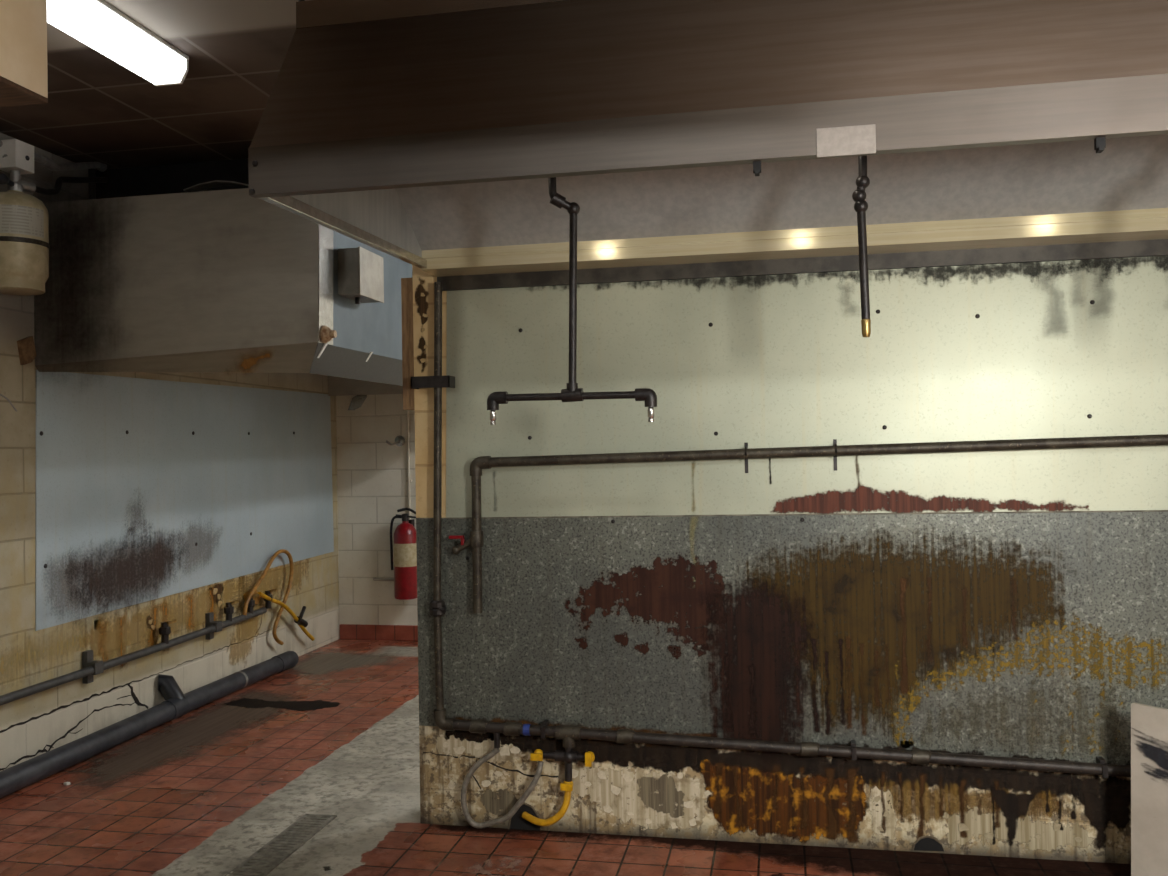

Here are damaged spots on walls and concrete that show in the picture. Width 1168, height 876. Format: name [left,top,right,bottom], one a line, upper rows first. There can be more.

crack [0,614,279,771]
corrosion [565,553,1069,843]
peeling [436,735,541,831]
peeling [557,761,712,831]